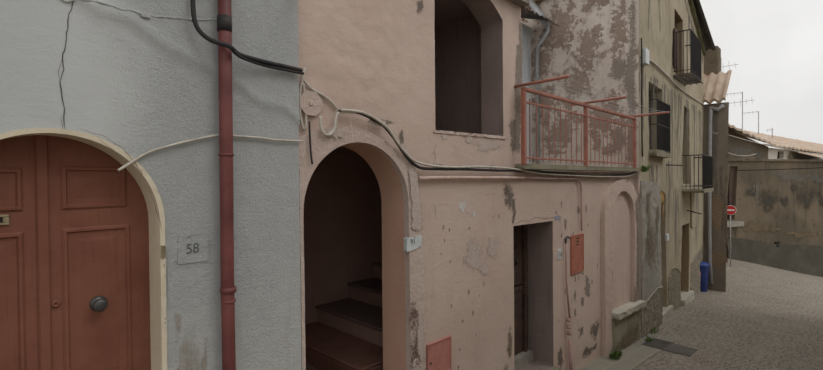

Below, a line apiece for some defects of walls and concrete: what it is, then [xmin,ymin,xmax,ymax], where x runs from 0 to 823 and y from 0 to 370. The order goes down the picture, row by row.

crack [58,1,211,299]
damp [504,183,516,223]
flaking render [465,0,637,163]
flaking render [634,192,728,337]